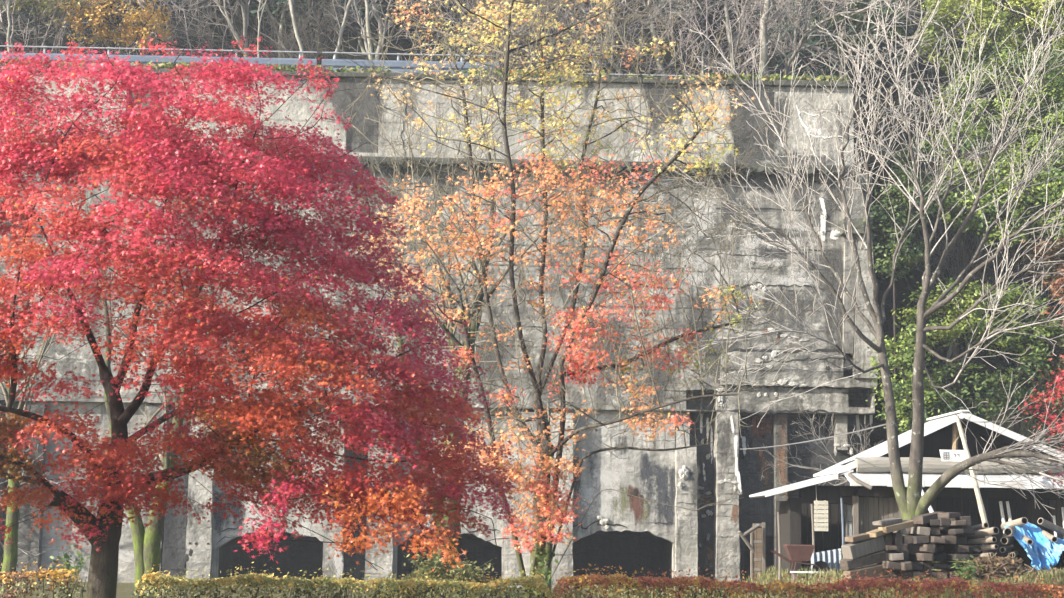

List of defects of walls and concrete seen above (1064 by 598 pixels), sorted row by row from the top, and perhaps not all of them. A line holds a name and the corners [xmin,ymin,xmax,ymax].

damp [572,455,593,503]
rust [628,487,643,521]
damp [614,454,680,546]
damp [690,413,759,507]